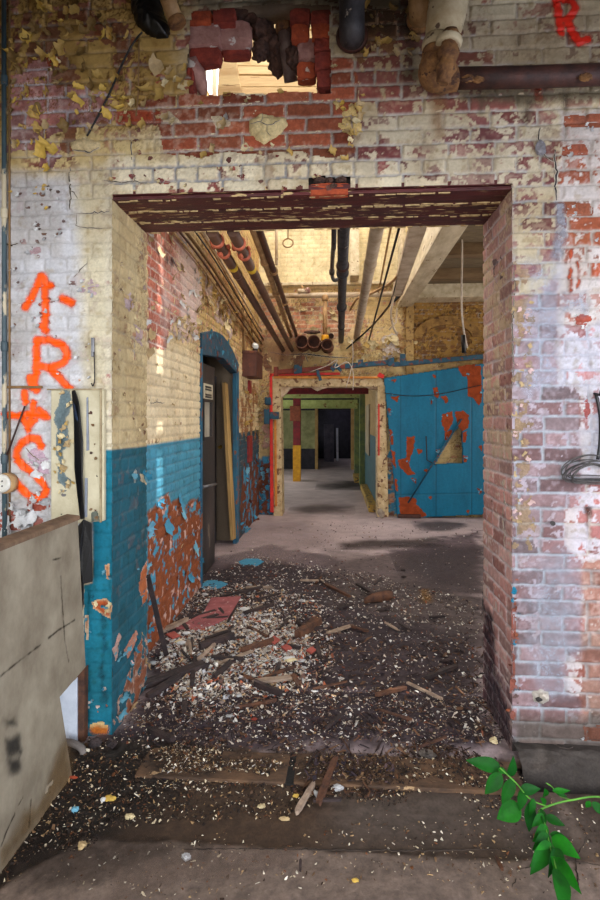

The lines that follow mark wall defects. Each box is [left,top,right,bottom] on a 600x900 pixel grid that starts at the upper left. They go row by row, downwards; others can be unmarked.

flaking render [0,0,422,189]
spalling [281,174,351,199]
crack [537,128,559,200]
flaking render [562,144,588,158]
flaking render [567,203,593,217]
flaking render [564,114,600,132]
flaking render [574,314,592,329]
peeling [0,390,75,535]
peeling [240,381,273,533]
peeling [84,492,204,725]